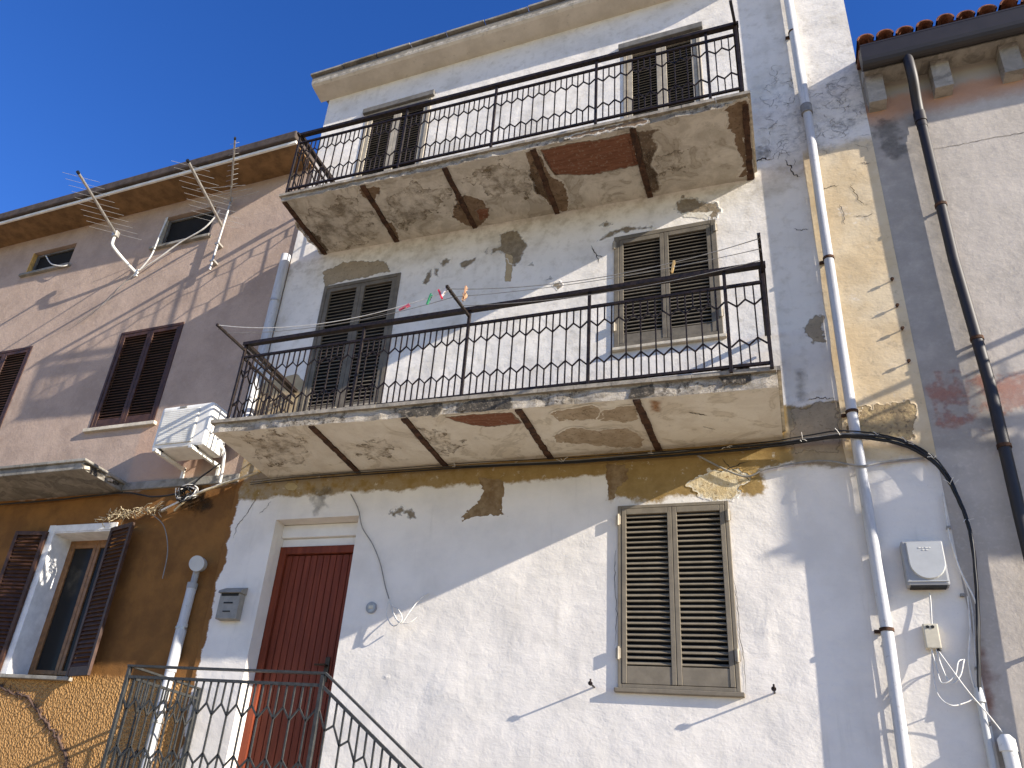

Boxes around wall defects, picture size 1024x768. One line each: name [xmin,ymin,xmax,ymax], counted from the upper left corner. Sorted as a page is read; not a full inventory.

spalling [522,117,663,212]